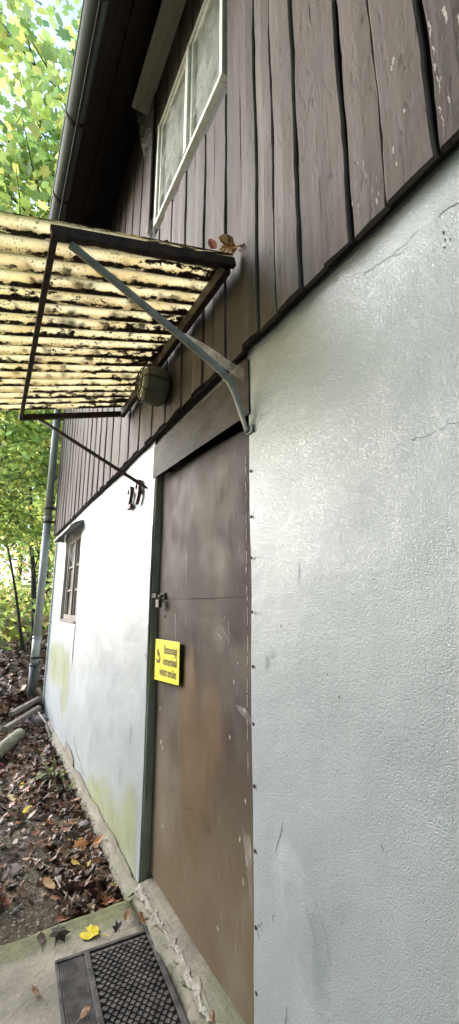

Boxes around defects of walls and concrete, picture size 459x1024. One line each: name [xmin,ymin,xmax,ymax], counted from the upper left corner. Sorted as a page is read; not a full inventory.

spalling [64,741,219,1024]